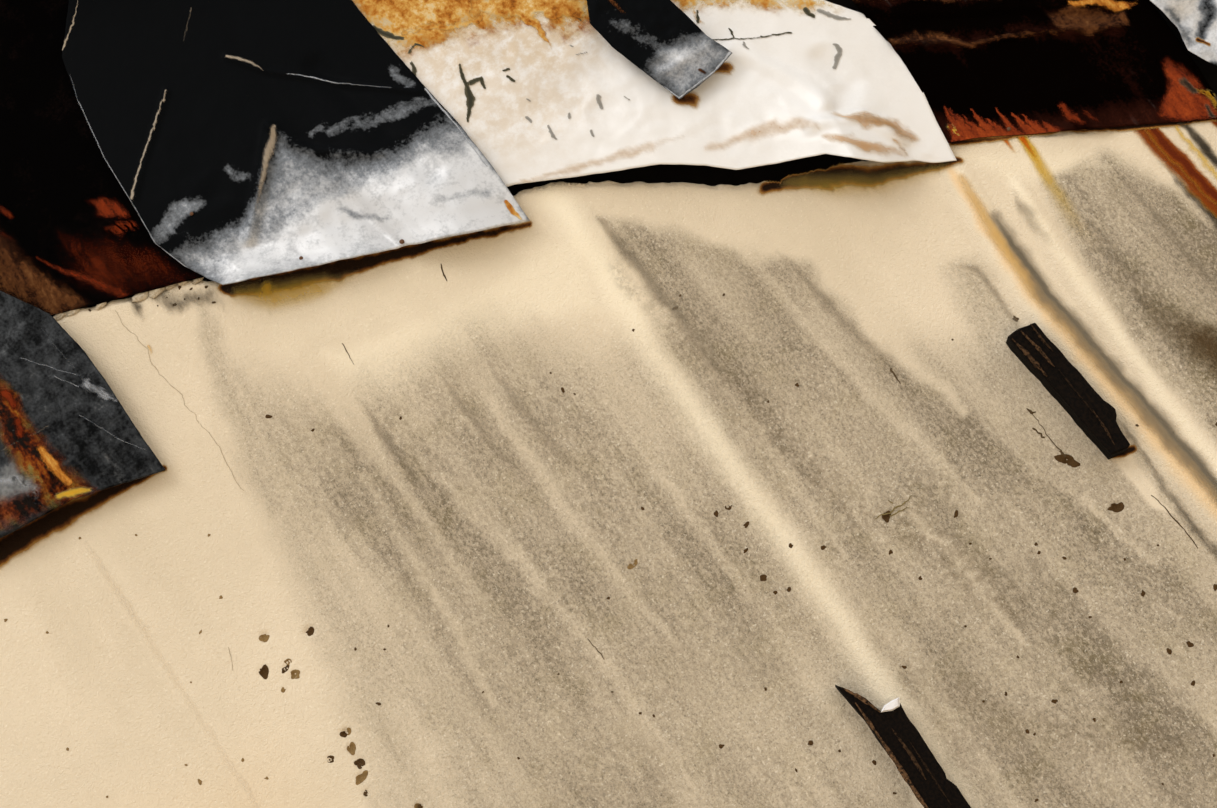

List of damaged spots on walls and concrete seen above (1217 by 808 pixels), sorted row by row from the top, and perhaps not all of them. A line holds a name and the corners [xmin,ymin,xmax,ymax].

peeling [373,25,424,76]
rust [352,0,592,52]
peeling [713,28,792,49]
peeling [803,7,850,20]
peeling [832,43,842,69]
peeling [459,64,486,122]
rust [759,60,1217,216]
spalling [53,302,107,321]
spalling [132,277,216,306]
rust [962,179,1217,500]
rust [0,384,167,567]